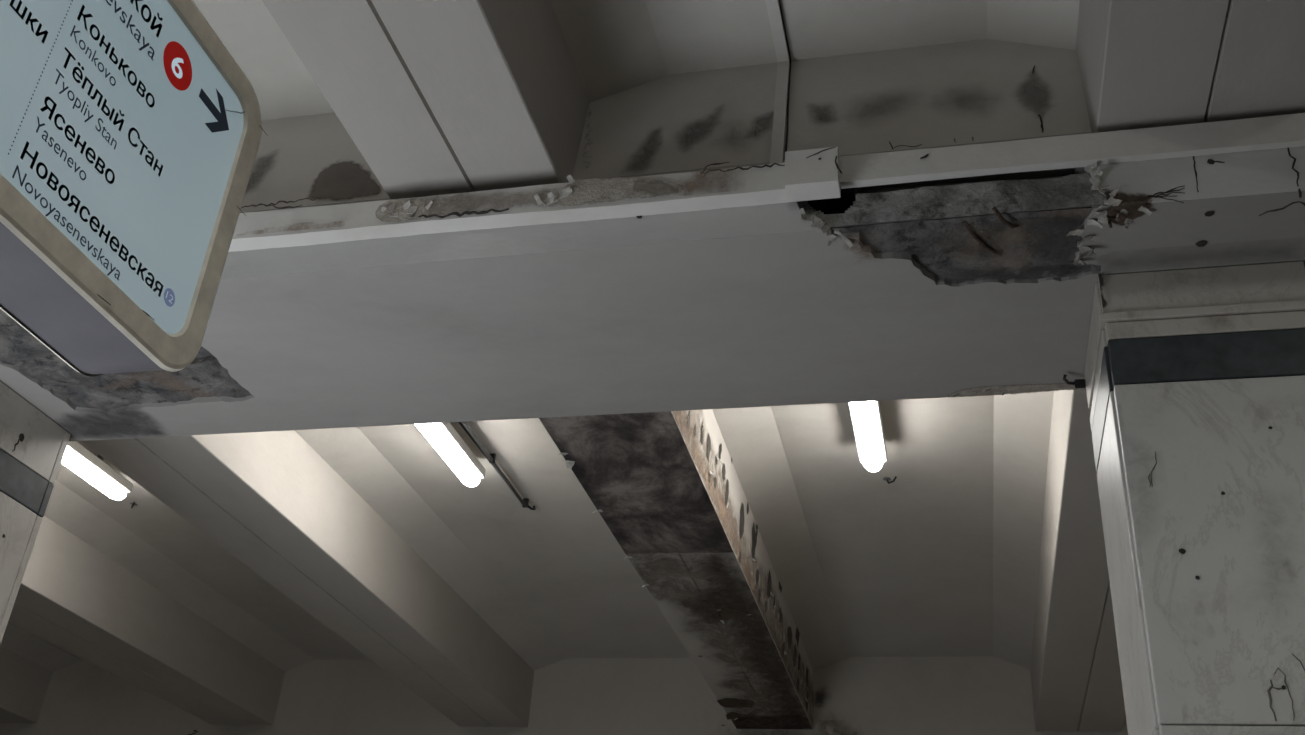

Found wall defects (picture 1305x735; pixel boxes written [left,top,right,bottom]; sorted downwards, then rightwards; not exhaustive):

water stain [681,116,717,147]
water stain [1020,65,1048,132]
crack [1259,147,1305,216]
spalling [797,162,1185,308]
spalling [0,309,252,436]
peeling [687,411,809,710]
peeling [714,698,757,720]
crack [1267,654,1305,721]